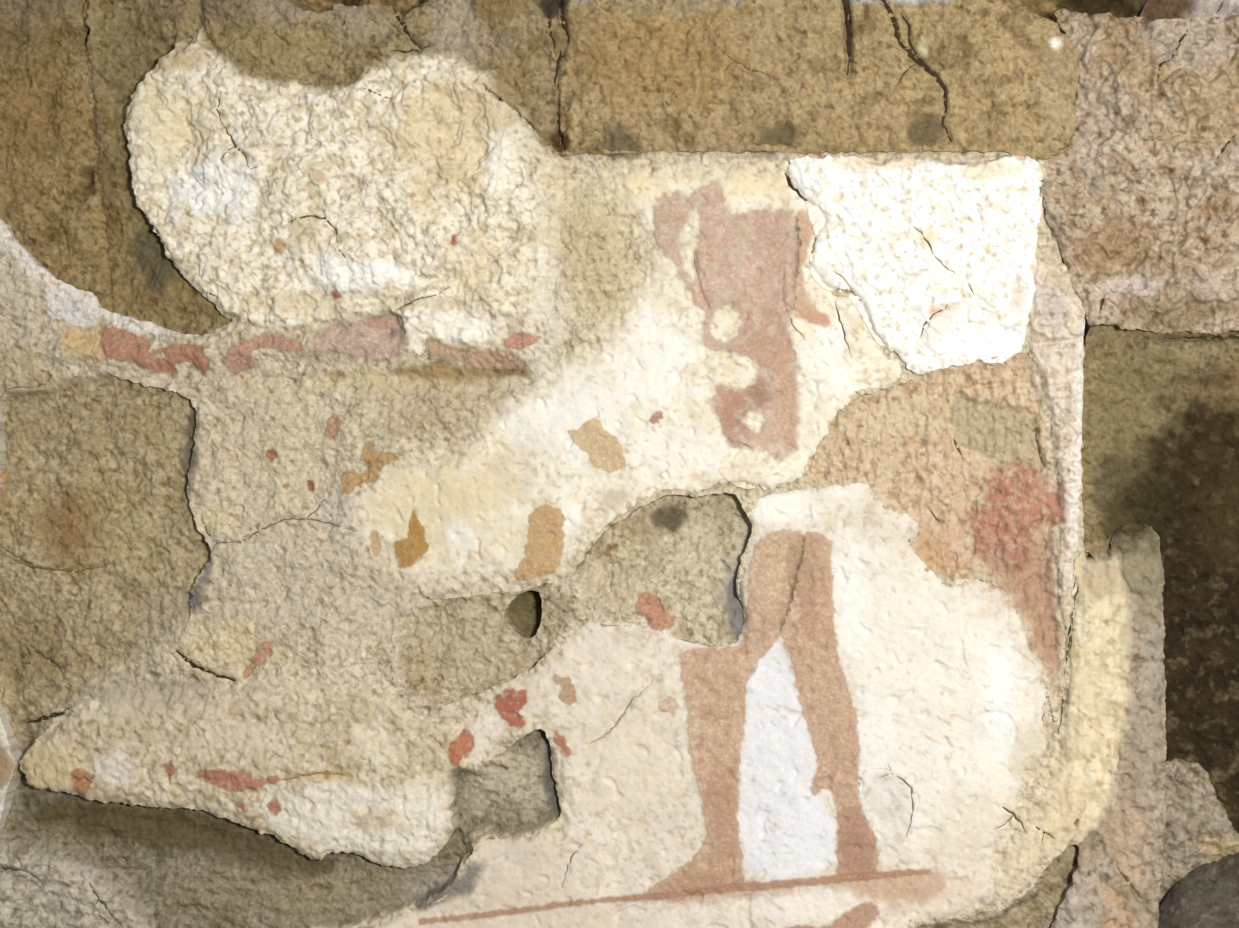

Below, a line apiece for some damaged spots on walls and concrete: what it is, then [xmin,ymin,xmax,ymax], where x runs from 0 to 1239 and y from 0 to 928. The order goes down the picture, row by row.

crack [547,0,569,138]
crack [842,0,852,76]
crack [881,0,963,154]
flaking render [388,155,1070,725]
crack [201,496,354,552]
crack [176,650,235,681]
flaking render [0,370,561,928]
damp [1103,405,1239,833]